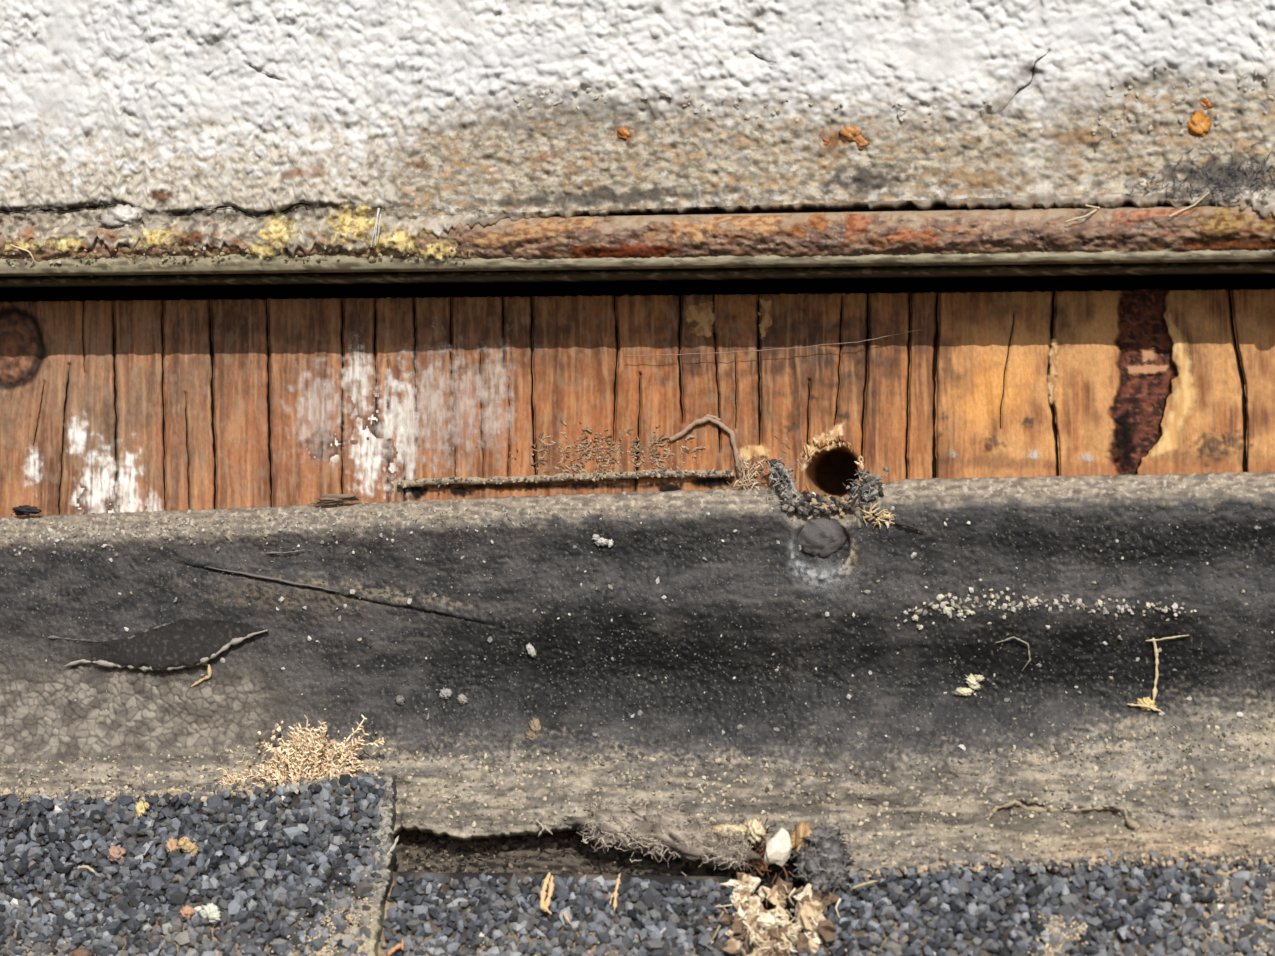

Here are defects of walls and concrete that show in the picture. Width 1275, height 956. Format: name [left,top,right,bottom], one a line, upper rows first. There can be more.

corrosion [1187,97,1214,137]
corrosion [617,126,632,143]
corrosion [822,125,870,150]
crack [0,203,125,213]
crack [168,203,501,216]
corrosion [785,214,828,237]
corrosion [175,231,202,244]
corrosion [571,241,674,259]
corrosion [1178,237,1275,252]
crack [184,563,502,628]